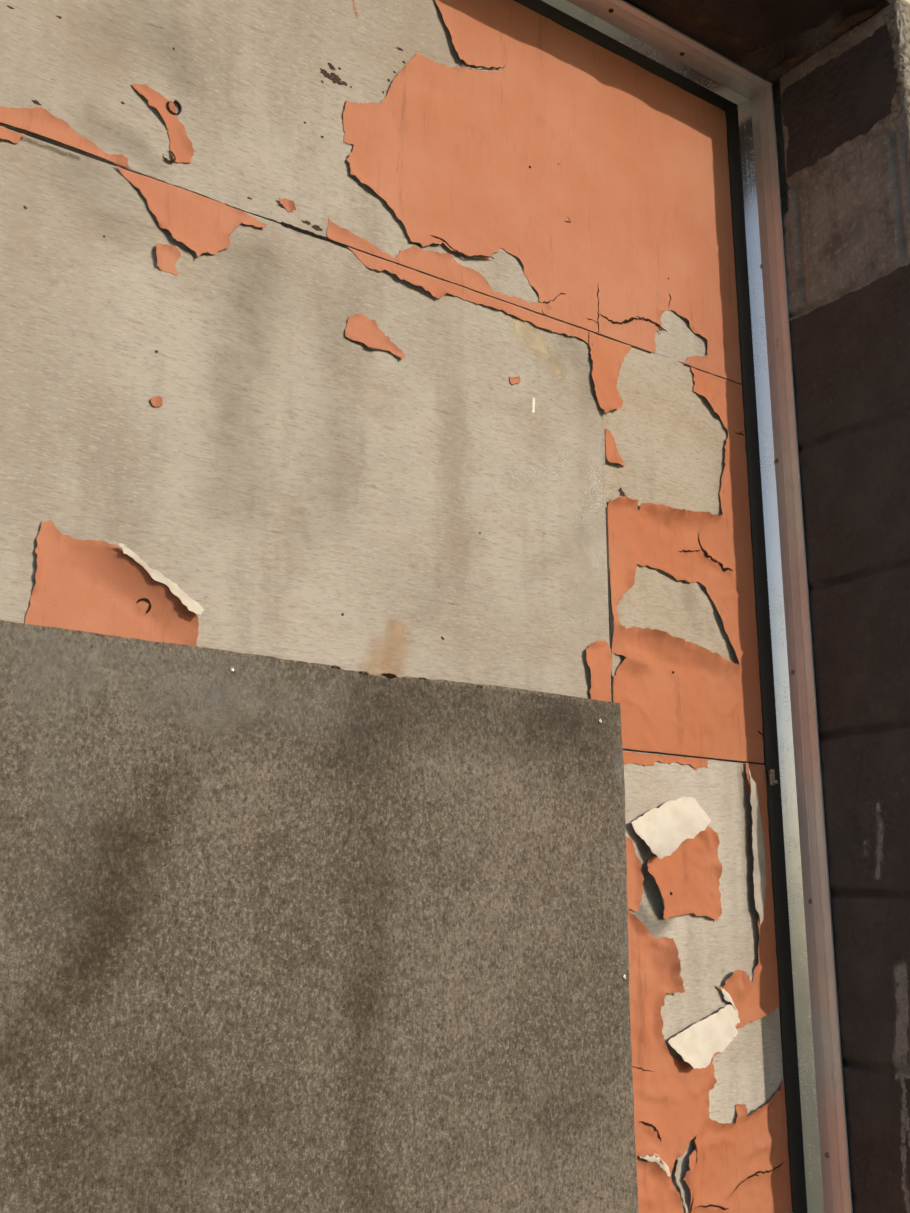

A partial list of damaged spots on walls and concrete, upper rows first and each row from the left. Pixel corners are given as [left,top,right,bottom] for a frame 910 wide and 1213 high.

crack [431,235,494,259]
crack [587,288,671,335]
peeling [0,0,732,702]
crack [679,534,732,572]
peeling [623,751,783,1124]
crack [640,1121,661,1141]
peeling [639,1139,693,1213]
crack [690,1163,783,1213]